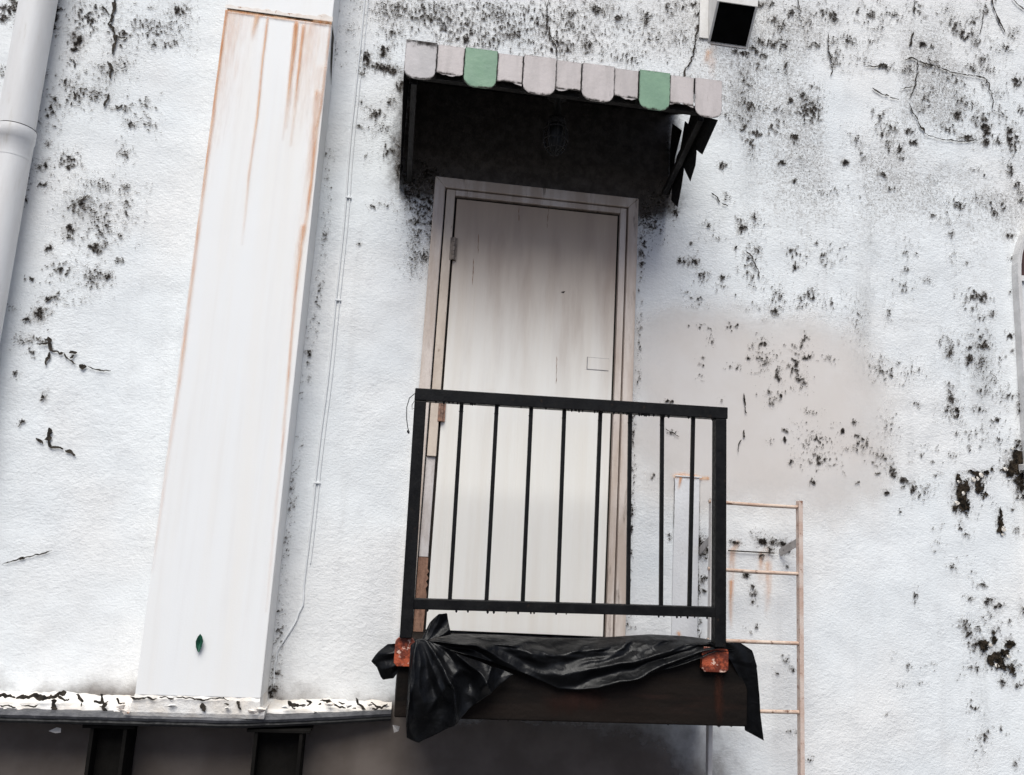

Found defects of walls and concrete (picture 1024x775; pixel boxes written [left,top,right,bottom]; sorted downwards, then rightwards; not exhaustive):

damp [38,0,200,164]
rust [212,10,332,127]
damp [335,0,713,291]
crack [683,10,700,77]
damp [720,0,1024,264]
crack [866,0,994,142]
damp [13,144,140,358]
crack [36,337,111,371]
damp [635,192,957,504]
crack [36,428,75,456]
damp [631,415,712,533]
crack [3,550,52,564]